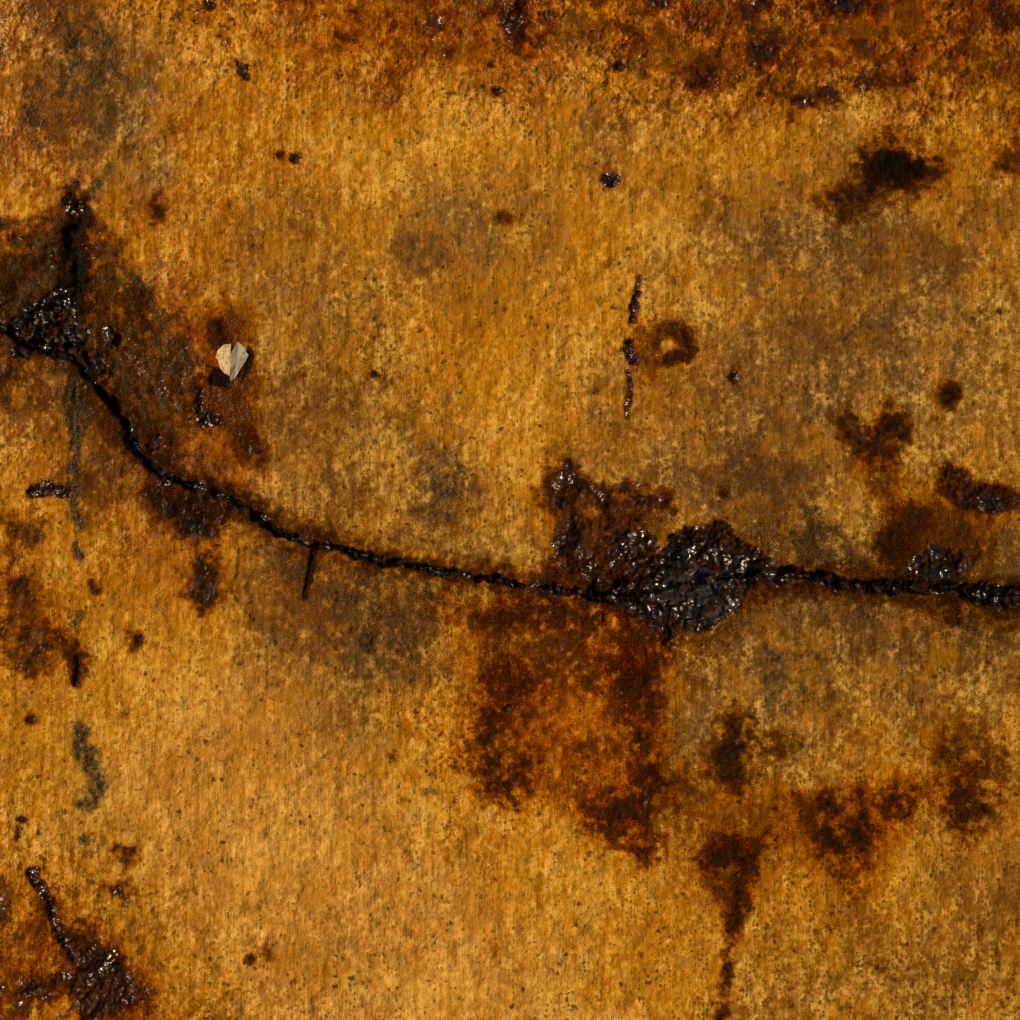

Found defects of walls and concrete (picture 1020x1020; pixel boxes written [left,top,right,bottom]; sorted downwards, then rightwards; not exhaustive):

rust [687,0,915,124]
rust [813,126,947,222]
crack [0,142,618,610]
crack [621,275,642,420]
damp [62,365,92,560]
rust [535,458,678,585]
rust [836,399,912,494]
crack [739,550,1020,628]
damp [70,721,108,812]
rust [452,604,693,867]
rust [703,700,786,796]
rust [0,920,151,1020]